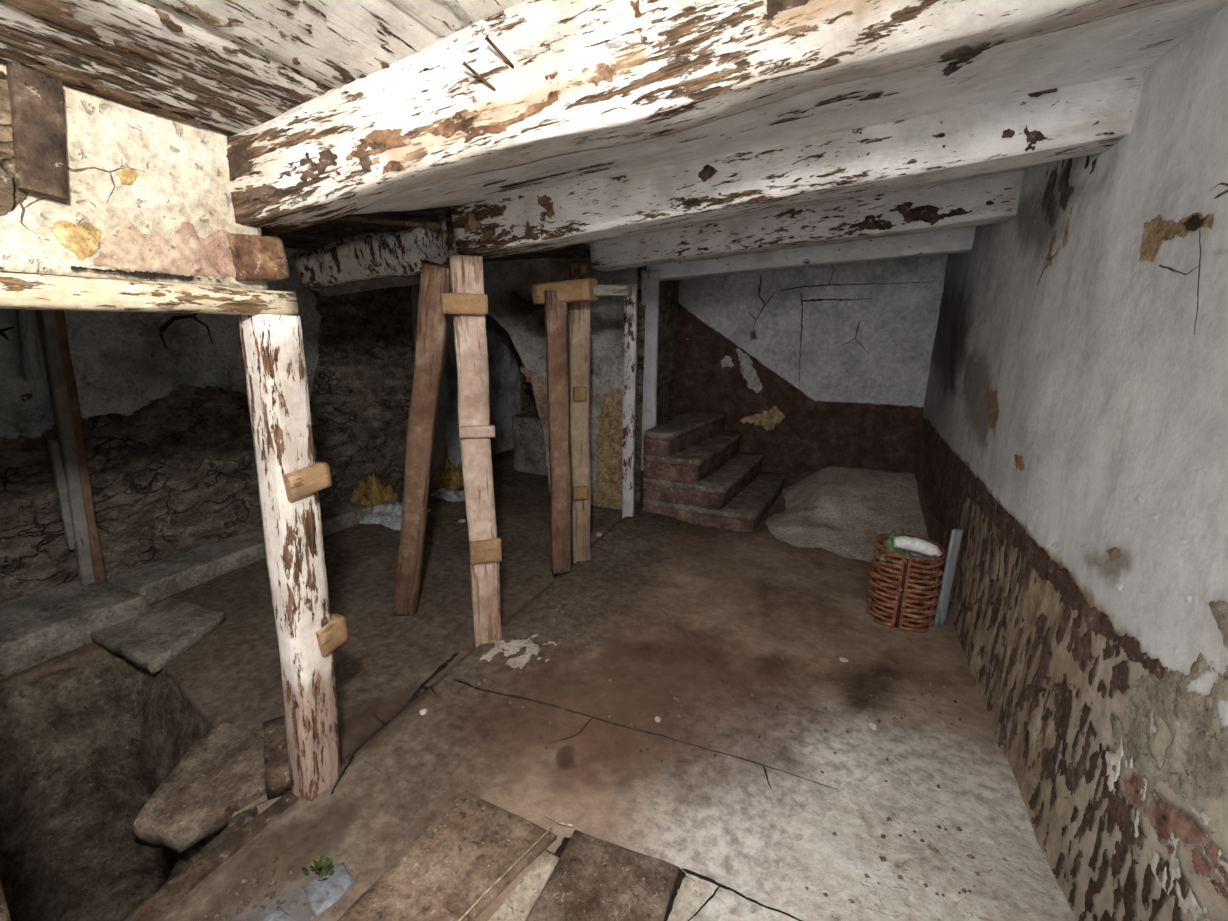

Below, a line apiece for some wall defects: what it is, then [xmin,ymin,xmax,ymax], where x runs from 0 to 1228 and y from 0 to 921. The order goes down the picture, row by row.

peeling [763,0,809,20]
spalling [0,0,262,216]
peeling [285,63,616,182]
peeling [463,162,618,250]
peeling [832,199,1010,236]
flaking render [1139,212,1214,262]
damp [935,286,967,391]
spalling [0,415,79,603]
spalling [82,384,263,576]
crack [330,652,838,795]
peeling [922,418,1228,921]
crack [682,868,803,921]